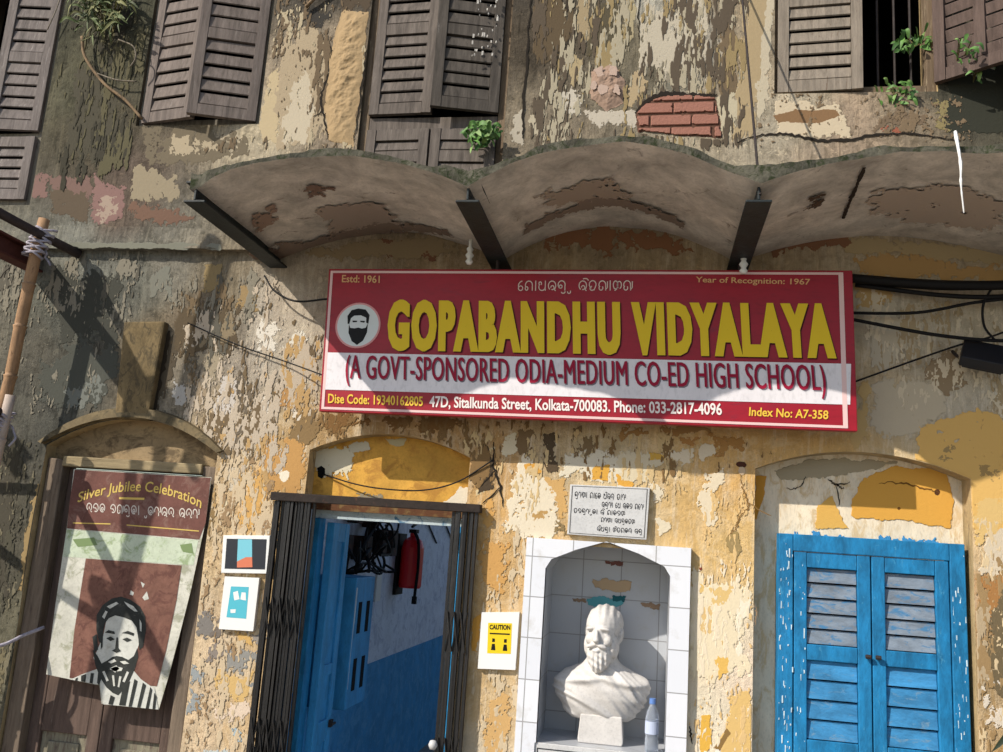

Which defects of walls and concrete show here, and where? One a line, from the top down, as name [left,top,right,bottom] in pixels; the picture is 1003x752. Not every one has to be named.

flaking render [32,3,180,225]
water stain [49,0,250,224]
flaking render [169,133,218,156]
flaking render [251,2,335,152]
water stain [272,0,371,132]
water stain [523,176,685,235]
peeling [853,252,1003,281]
peeling [20,241,370,752]
crack [728,474,771,536]
peeling [811,283,1003,581]
flaking render [444,425,766,752]
peeling [778,628,806,752]